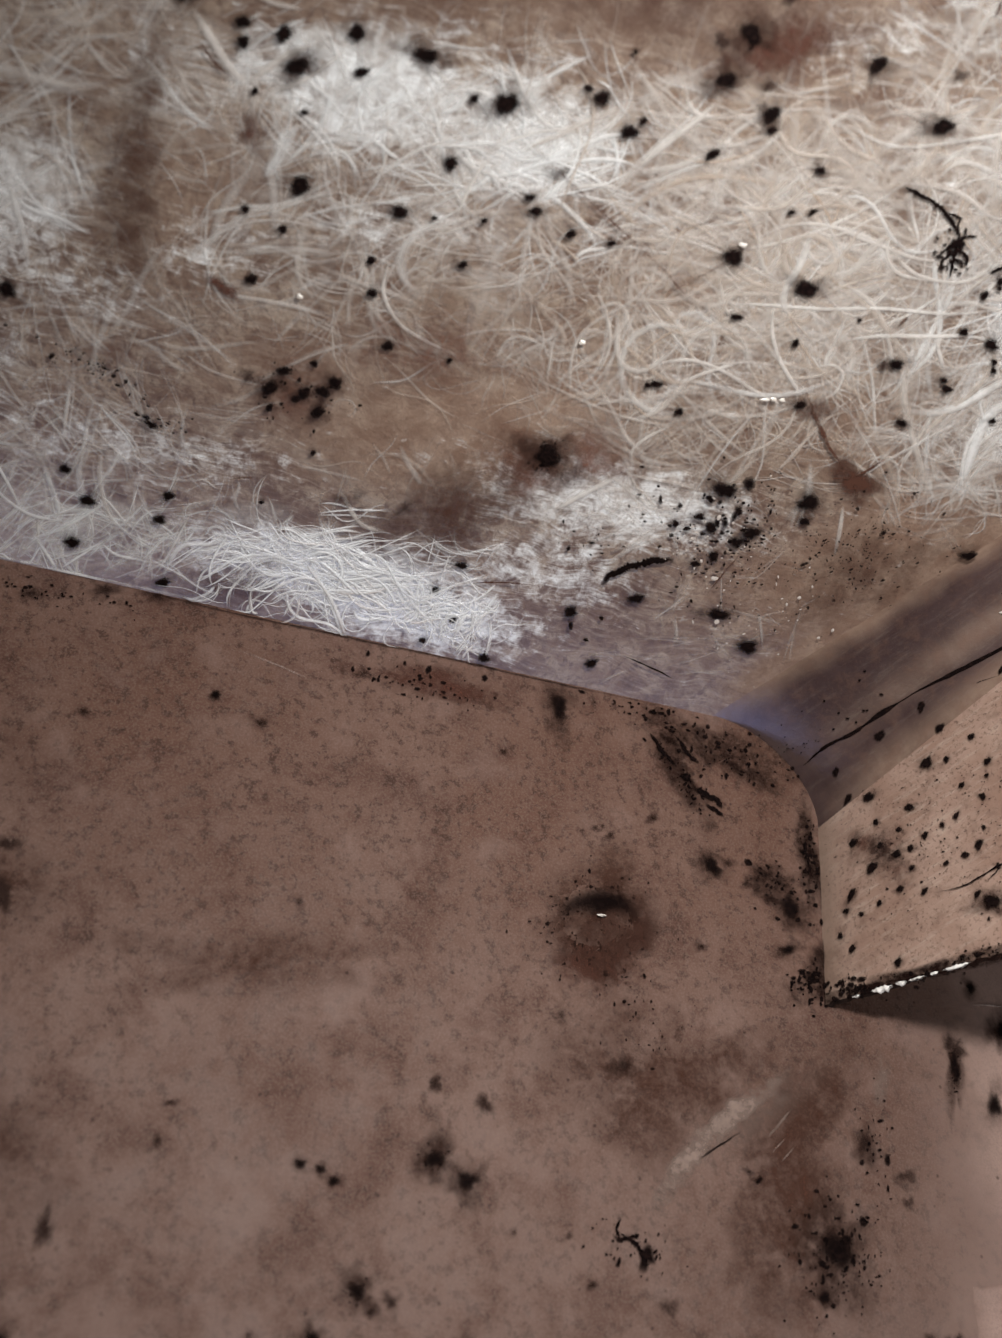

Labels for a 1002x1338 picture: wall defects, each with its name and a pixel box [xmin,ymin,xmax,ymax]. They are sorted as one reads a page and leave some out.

mould [286,52,317,81]
mould [470,93,519,115]
leakage [621,117,648,138]
leakage [760,81,780,134]
leakage [922,118,956,134]
mould [905,187,977,276]
mould [795,280,819,297]
leakage [2,575,819,816]
crack [804,647,1002,765]
leakage [843,723,1002,924]
mould [744,812,836,927]
leakage [591,1218,666,1277]